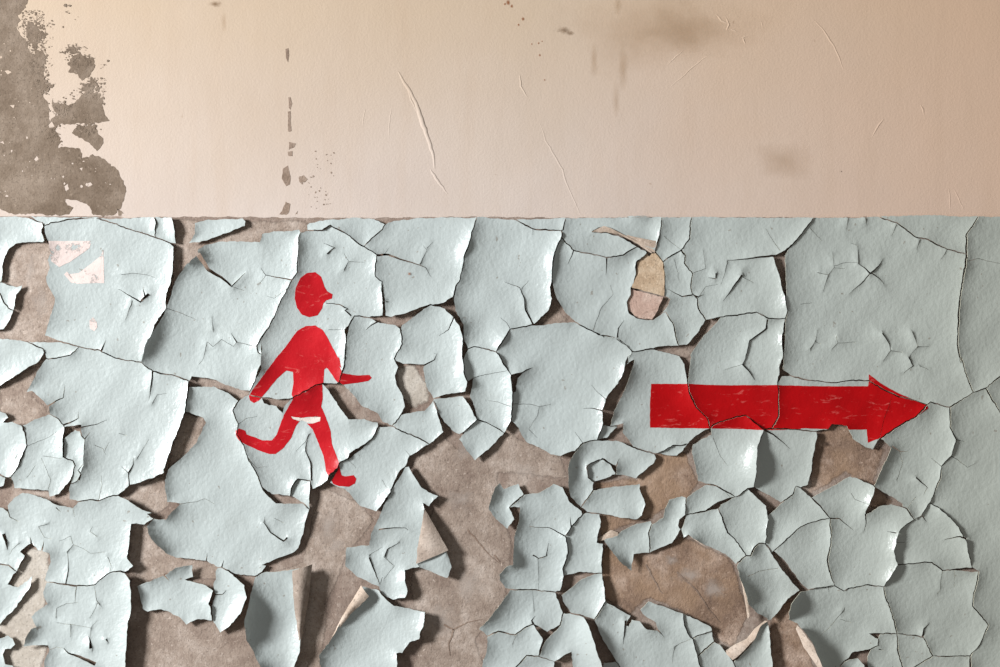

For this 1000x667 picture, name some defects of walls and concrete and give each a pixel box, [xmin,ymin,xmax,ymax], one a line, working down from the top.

spalling [282,97,334,205]
peeling [0,215,1000,667]